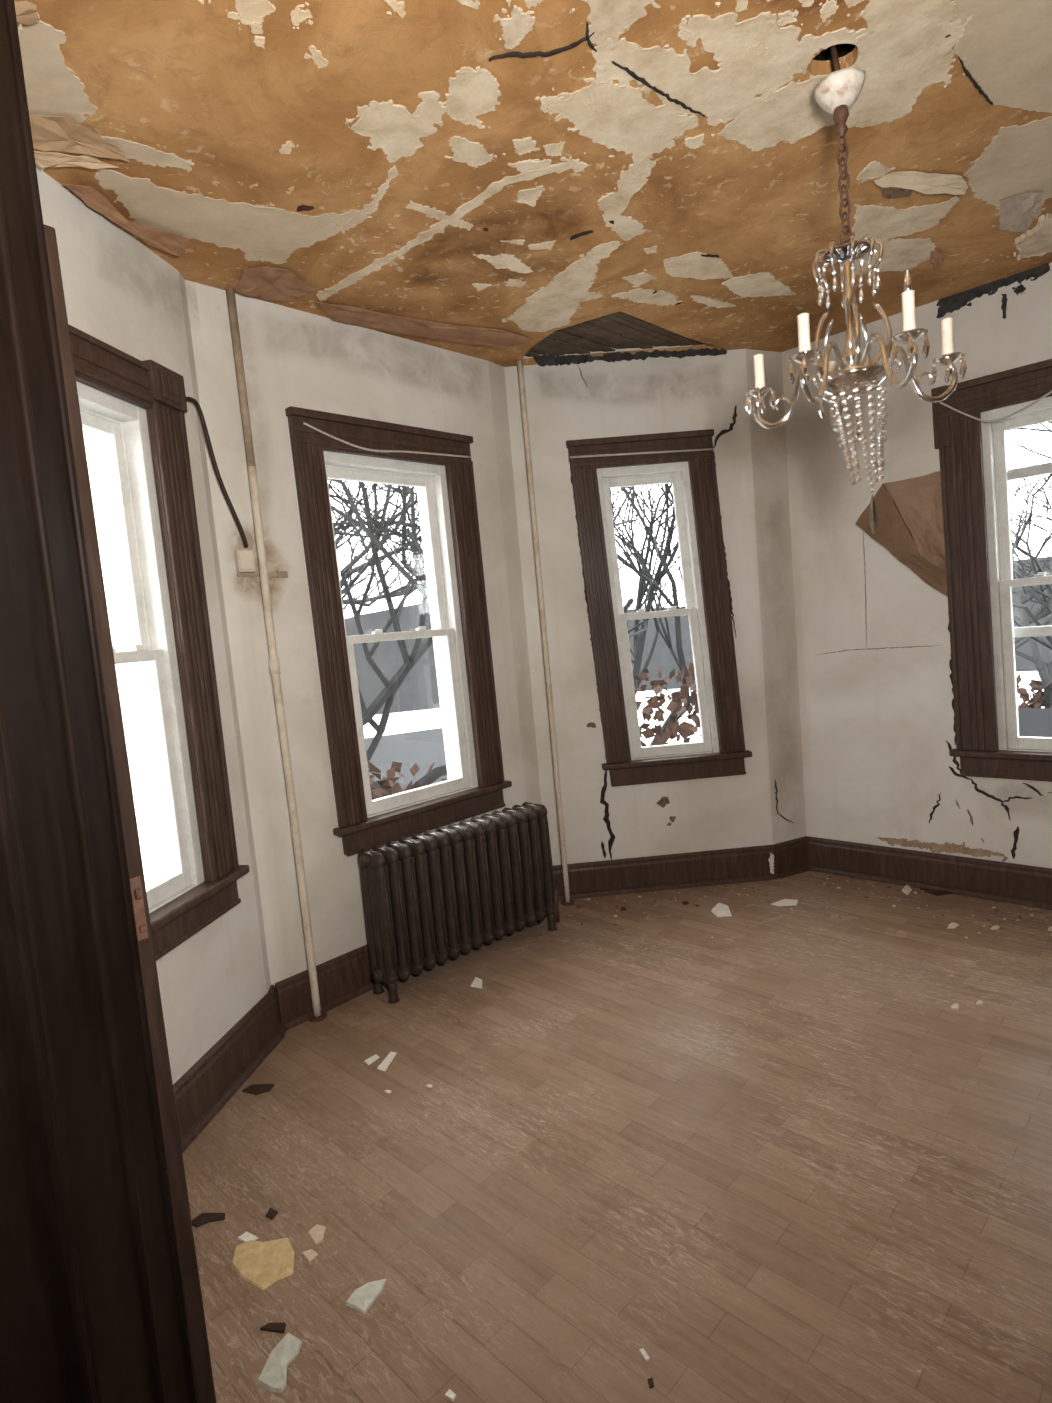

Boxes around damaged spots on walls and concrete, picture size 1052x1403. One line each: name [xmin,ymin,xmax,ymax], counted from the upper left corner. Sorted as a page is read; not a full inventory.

peeling [198,0,313,49]
peeling [304,45,329,69]
crack [489,22,705,117]
crack [945,34,993,105]
peeling [101,135,195,172]
peeling [279,141,299,154]
flaking render [316,0,973,367]
flaking render [1014,213,1052,261]
crack [568,455,615,860]
crack [817,534,1052,859]